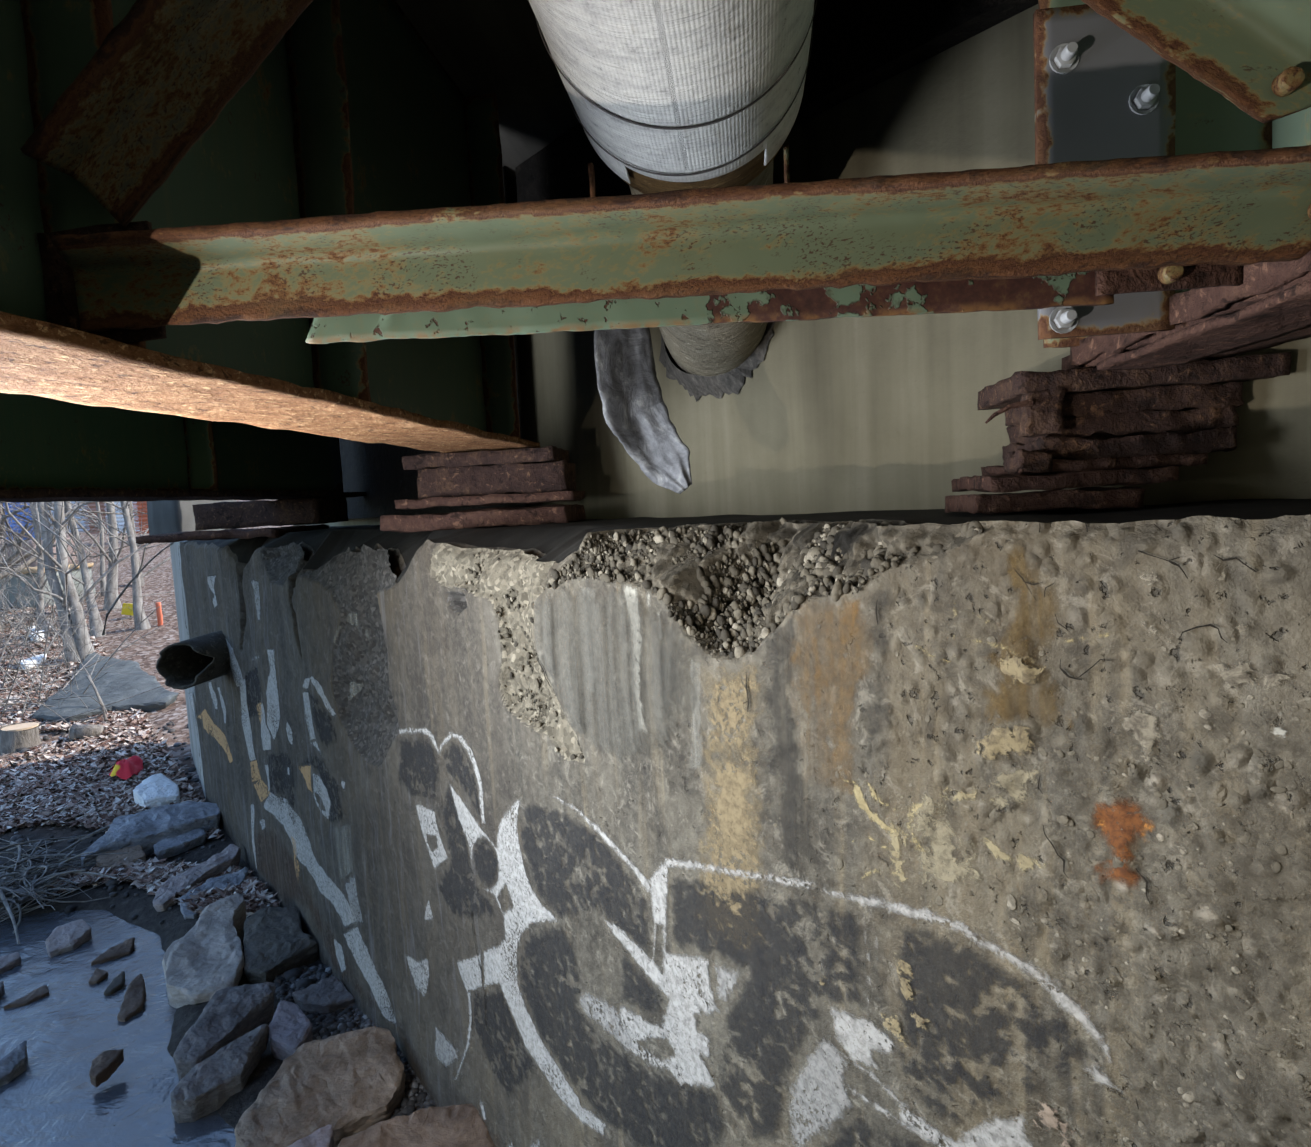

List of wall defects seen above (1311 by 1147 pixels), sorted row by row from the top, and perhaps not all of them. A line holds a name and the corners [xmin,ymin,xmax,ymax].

spalling [429,517,1002,763]
crack [1179,624,1227,643]
corrosion [1094,801,1152,883]